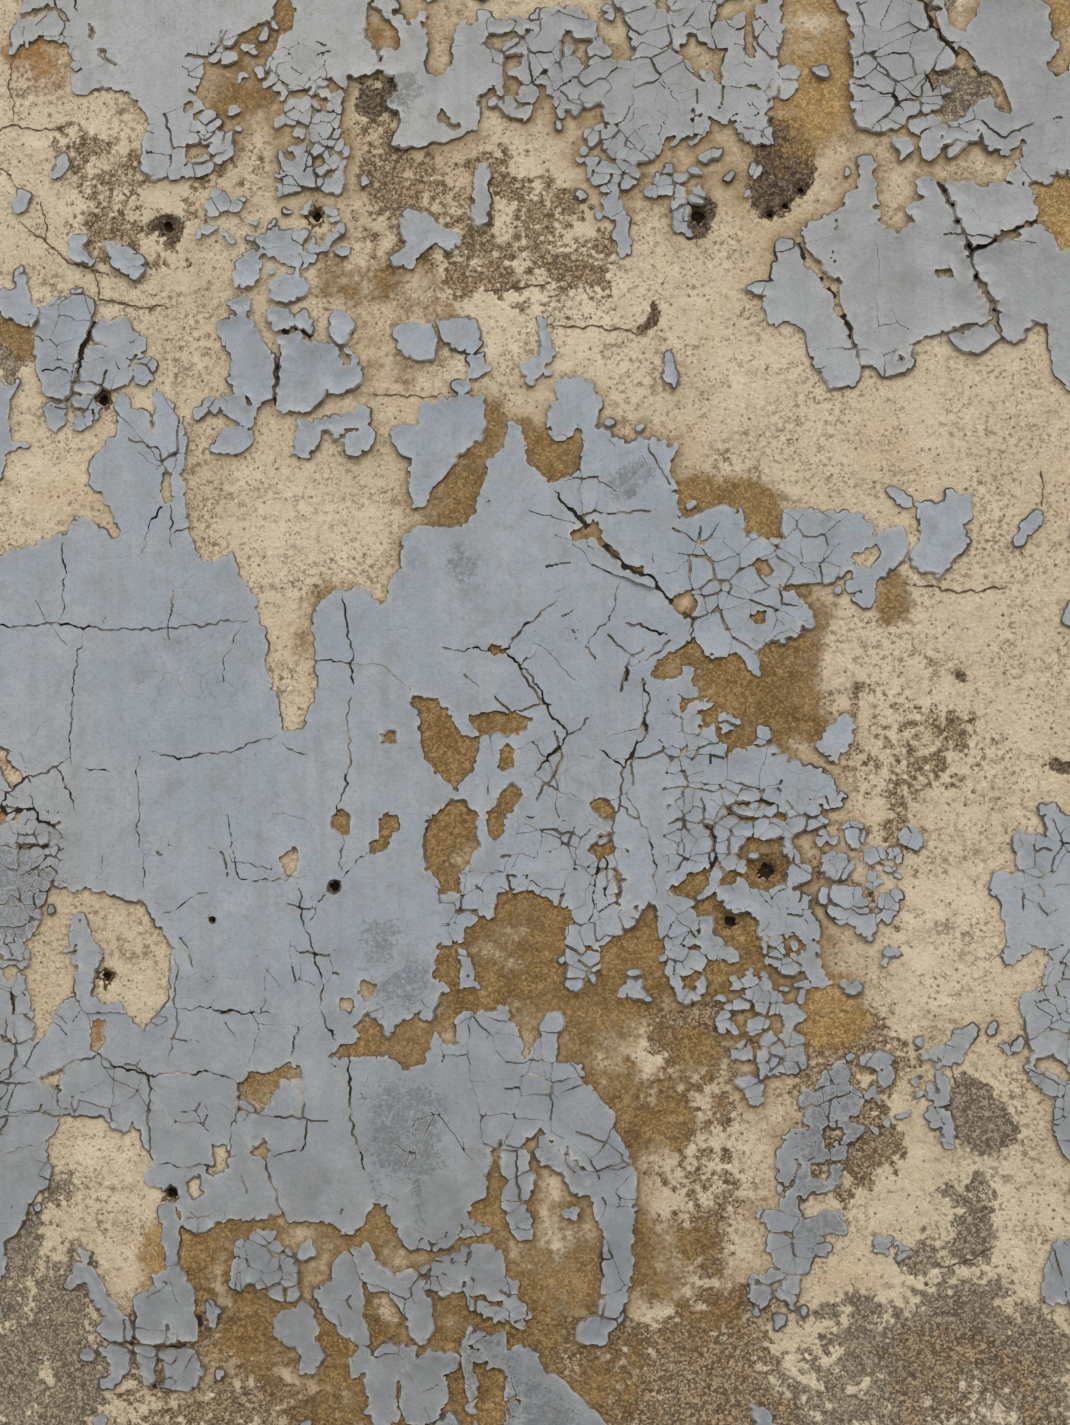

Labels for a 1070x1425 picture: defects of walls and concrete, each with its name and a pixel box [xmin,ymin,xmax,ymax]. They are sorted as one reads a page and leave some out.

peeling [365,0,400,62]
crack [861,0,979,109]
peeling [438,109,460,130]
peeling [935,269,954,278]
crack [936,181,1038,312]
peeling [570,477,655,588]
crack [555,491,695,636]
crack [0,559,214,850]
crack [462,622,568,771]
crack [603,664,649,769]
peeling [617,968,654,1003]
peeling [235,1062,305,1122]